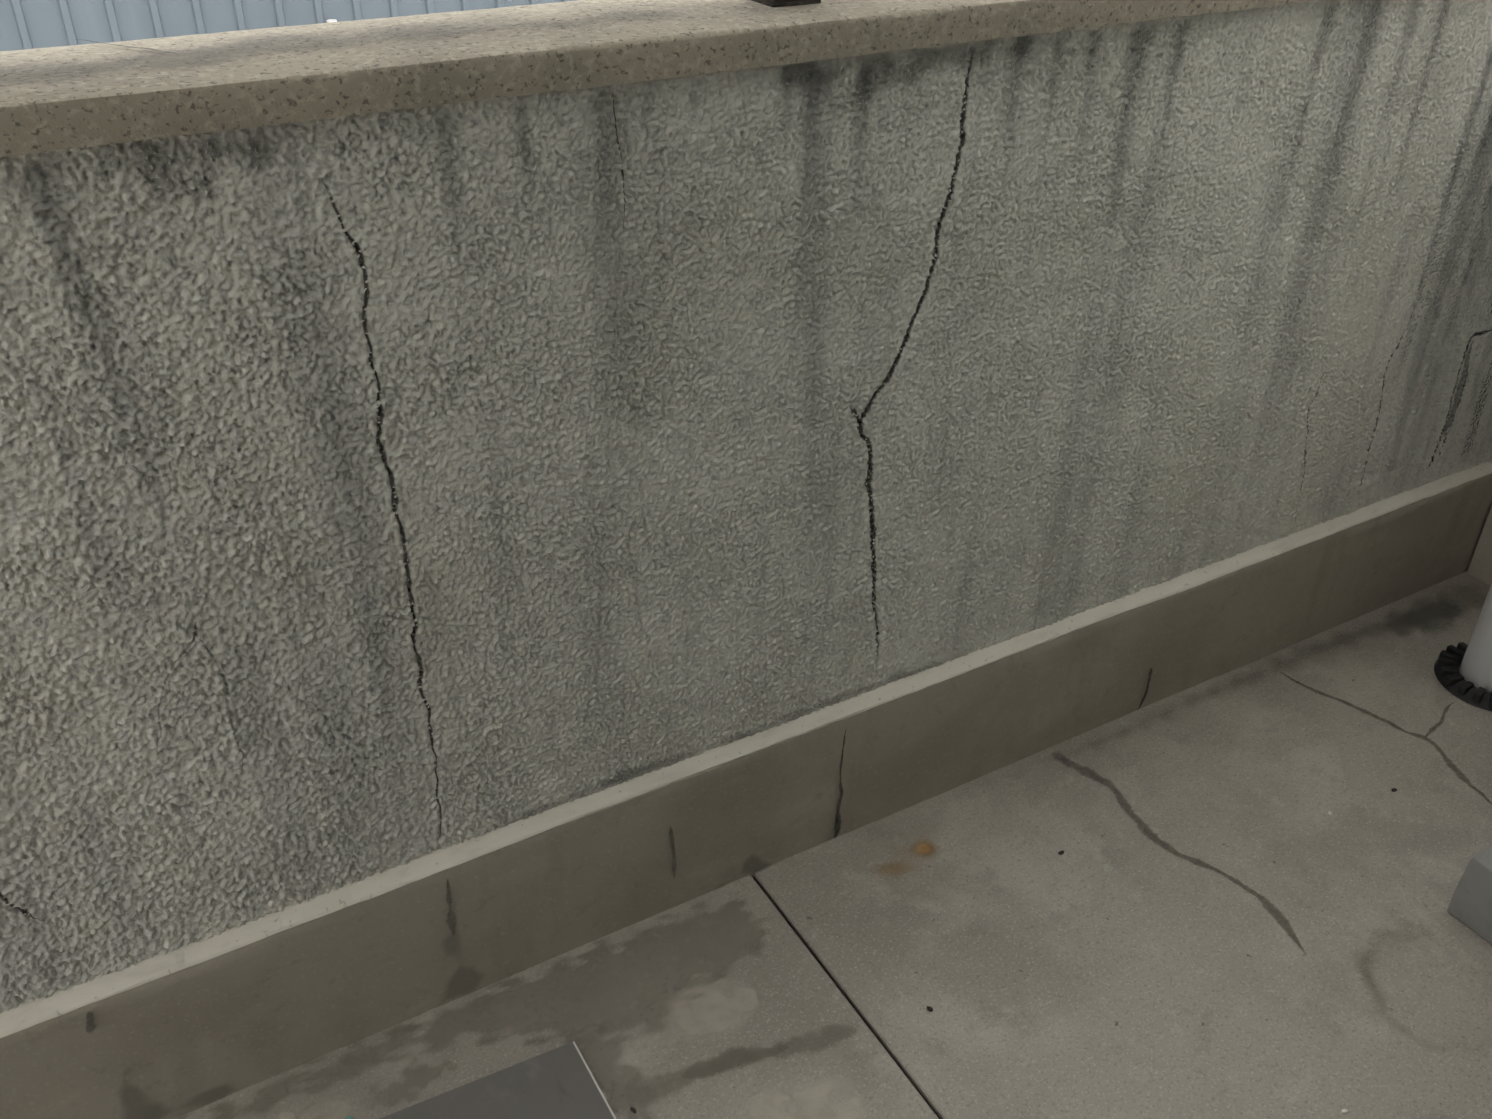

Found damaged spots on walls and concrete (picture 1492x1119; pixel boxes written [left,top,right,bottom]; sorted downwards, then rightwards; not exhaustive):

crack [851,64,971,651]
crack [330,196,442,833]
crack [1287,676,1492,804]
crack [0,893,43,922]
crack [1058,757,1302,949]